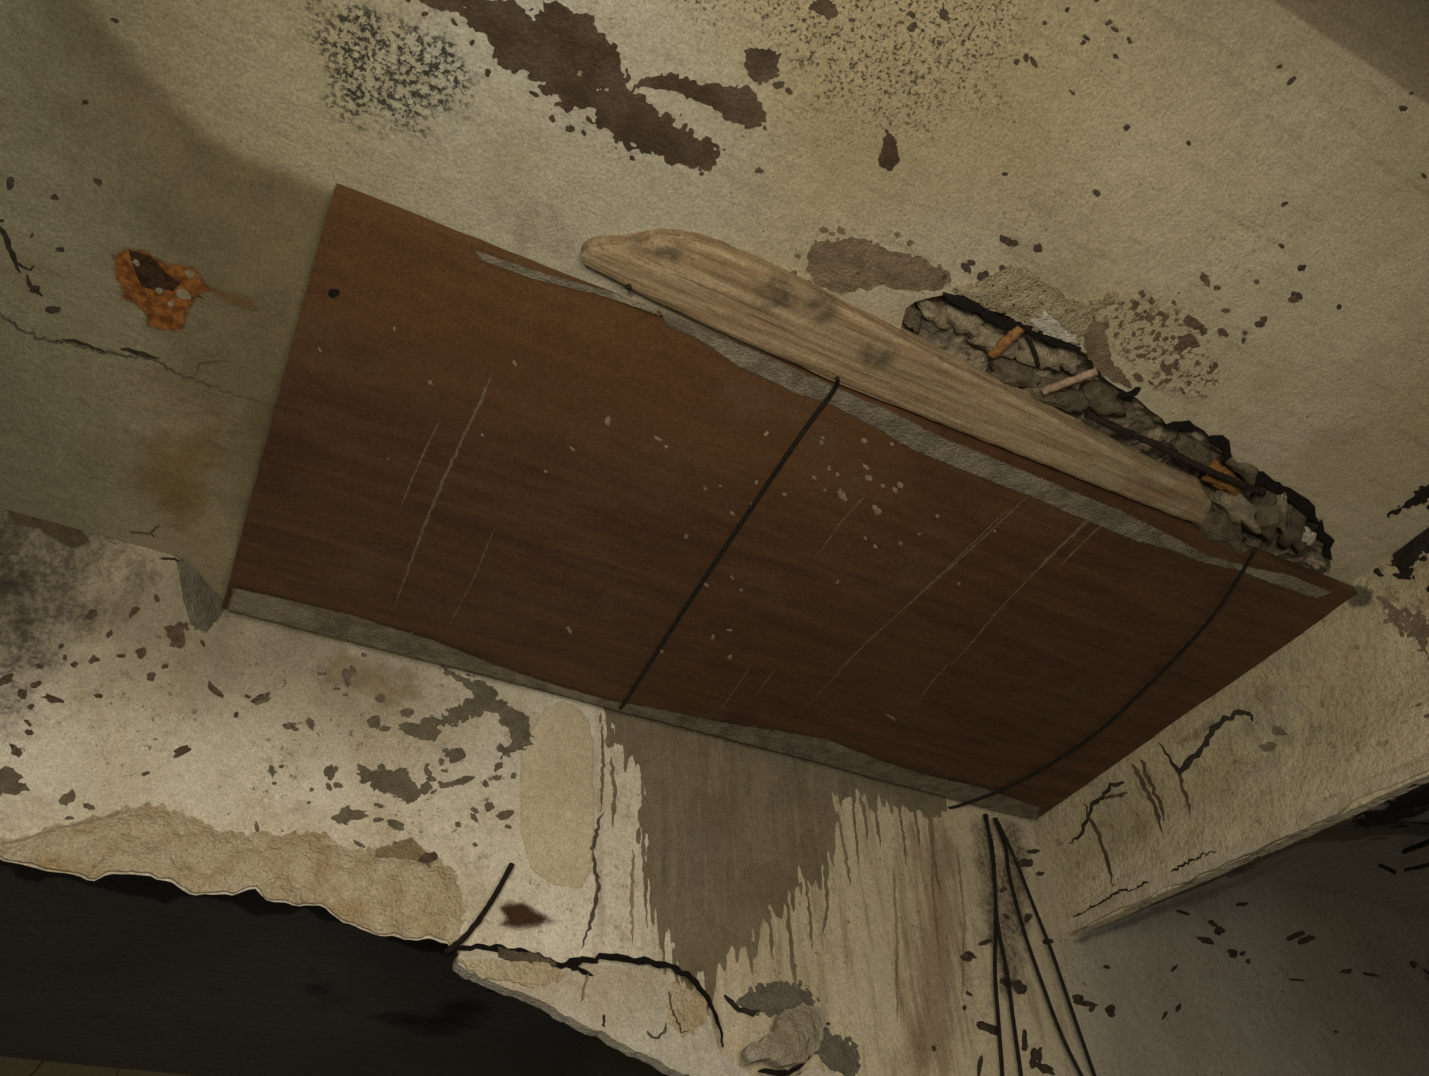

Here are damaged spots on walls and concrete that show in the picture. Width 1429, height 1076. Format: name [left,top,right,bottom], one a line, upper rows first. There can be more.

mould [309,3,467,132]
crack [0,219,43,297]
crack [0,312,268,405]
rust [113,250,213,330]
spalling [790,226,1335,574]
mould [0,510,115,710]
peeling [160,557,224,649]
spalling [1373,527,1429,592]
spalling [0,663,861,1076]
crack [443,813,724,1047]
damp [599,707,947,1023]
crack [1069,709,1278,918]